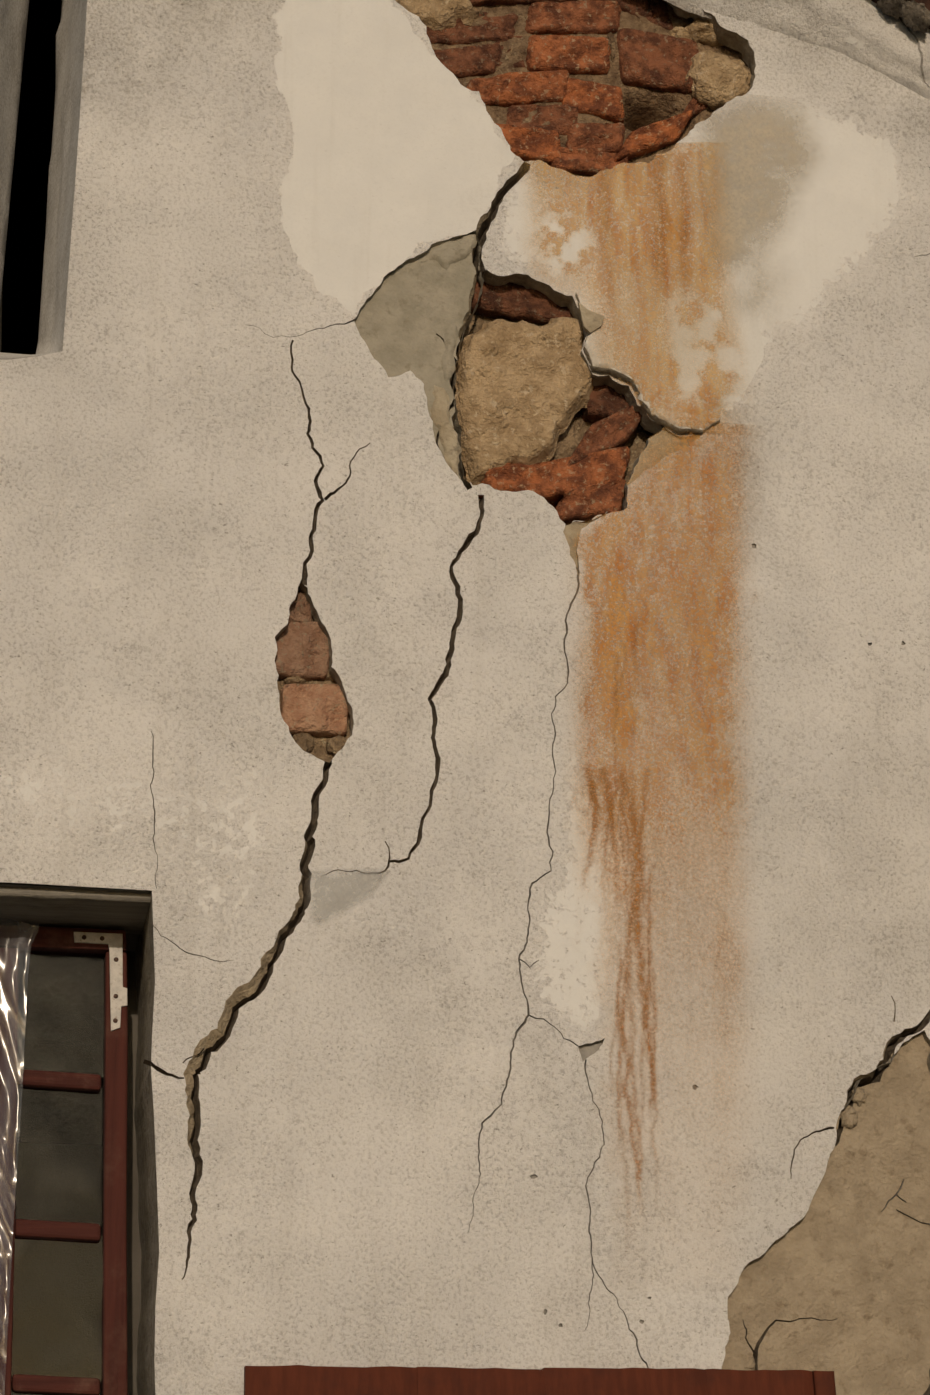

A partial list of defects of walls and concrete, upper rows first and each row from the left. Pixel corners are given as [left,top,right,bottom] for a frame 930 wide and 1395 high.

flaking render [395,0,756,177]
crack [250,319,370,591]
flaking render [275,582,354,769]
crack [436,162,530,471]
flaking render [354,230,701,574]
corrosion [535,144,737,1091]
crack [143,496,485,1280]
crack [468,567,649,1368]
flaking render [722,1027,930,1395]
crack [790,996,930,1178]